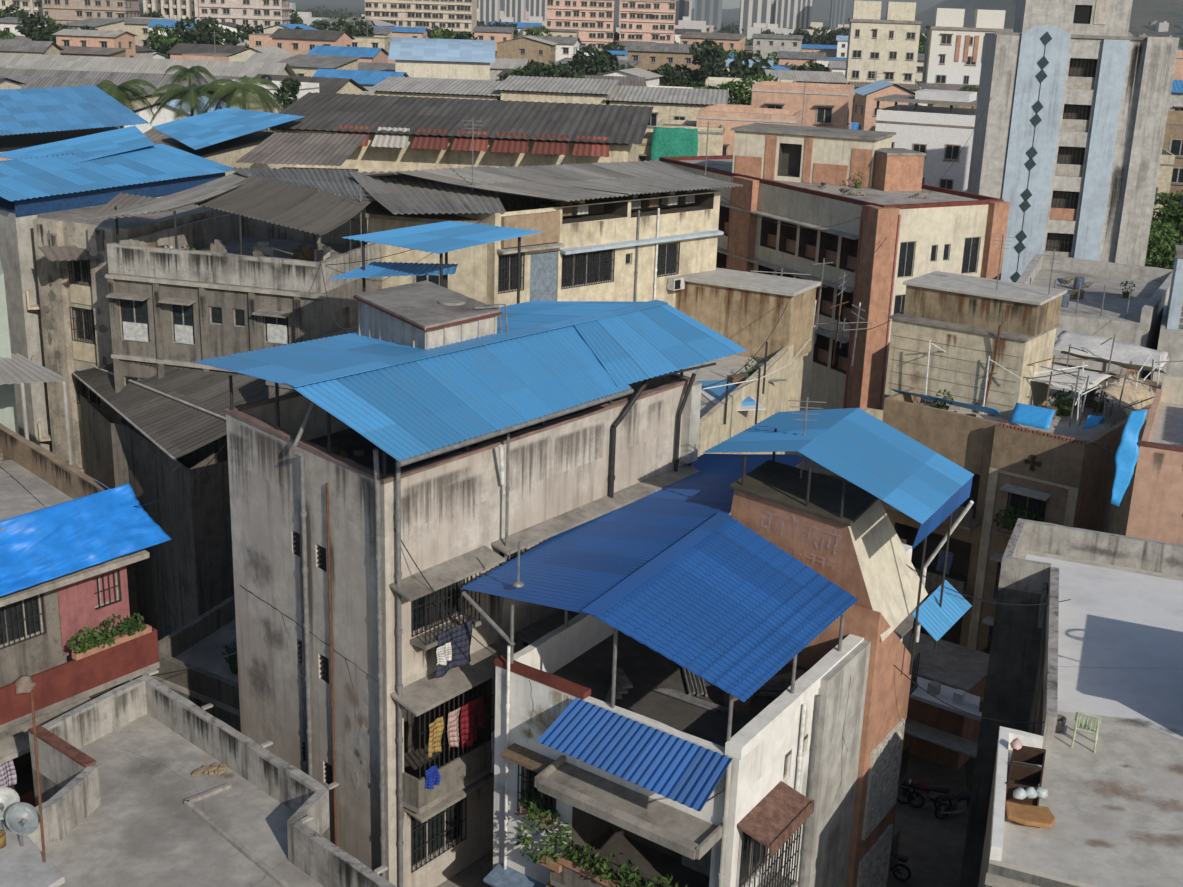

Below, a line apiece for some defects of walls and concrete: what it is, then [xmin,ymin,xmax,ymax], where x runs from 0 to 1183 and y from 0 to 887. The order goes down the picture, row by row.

water stain [1125,45,1142,138]
water stain [1106,169,1124,236]
water stain [230,431,288,478]
water stain [360,478,376,532]
water stain [402,473,475,523]
water stain [299,510,313,627]
water stain [184,710,238,759]
water stain [262,759,311,792]